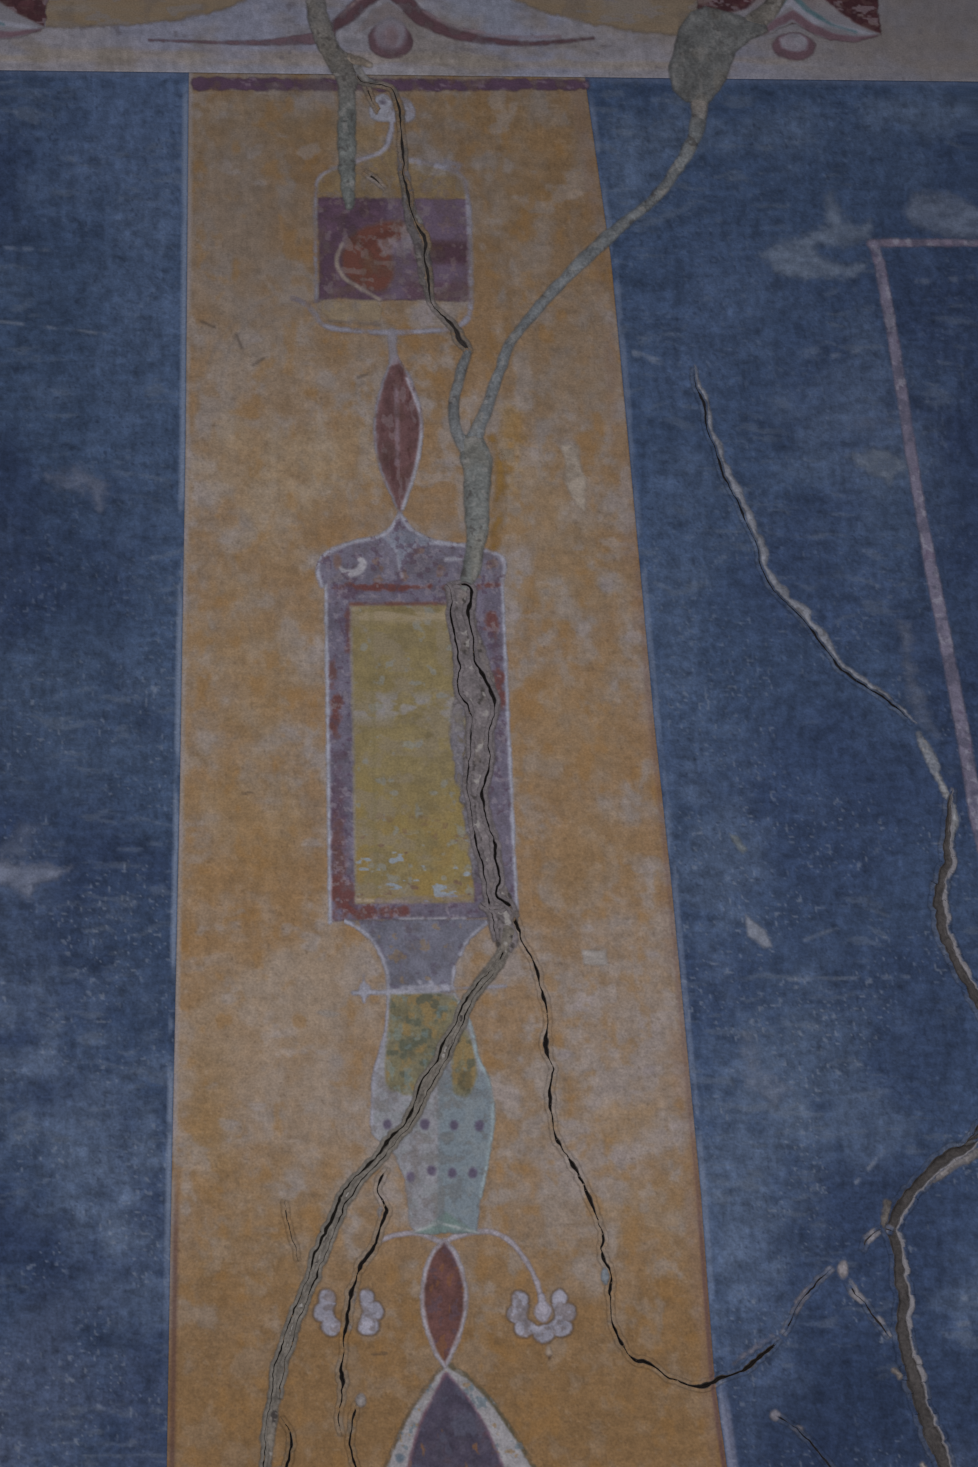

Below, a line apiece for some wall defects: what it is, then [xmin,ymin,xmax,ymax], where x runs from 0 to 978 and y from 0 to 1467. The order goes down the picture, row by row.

crack [259,0,978,1467]